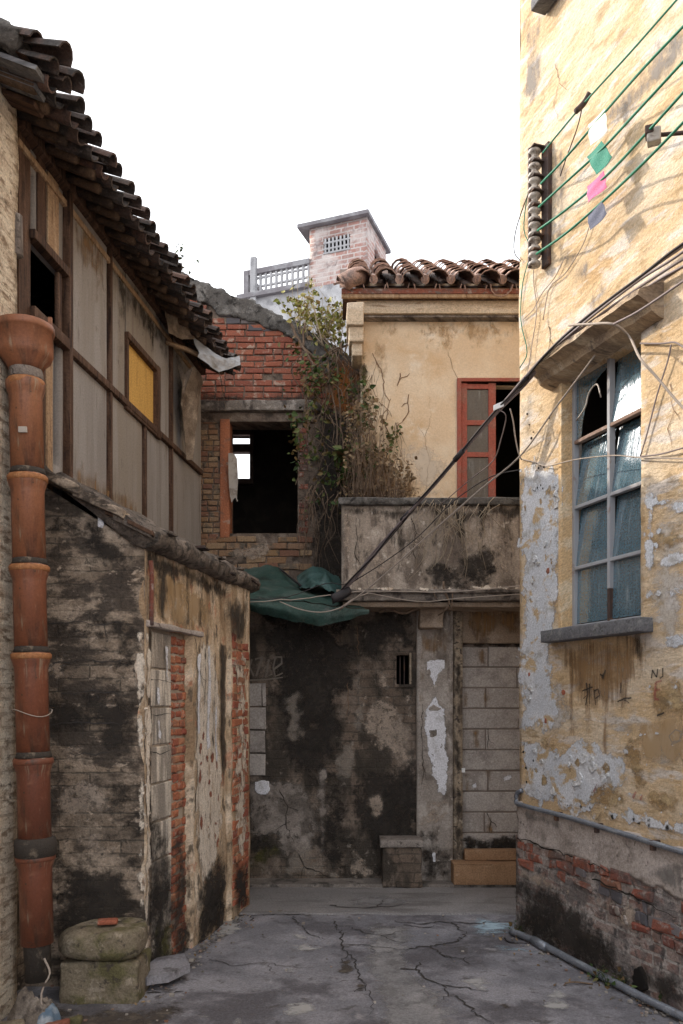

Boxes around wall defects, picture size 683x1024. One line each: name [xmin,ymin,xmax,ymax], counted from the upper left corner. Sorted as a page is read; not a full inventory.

damp [420,546,518,591]
damp [70,612,138,669]
peeling [516,456,683,834]
damp [565,636,640,703]
damp [58,781,139,820]
flaking render [232,634,250,909]
damp [266,612,520,878]
peeling [424,705,448,750]
damp [53,850,136,931]
crack [238,900,509,1024]
damp [474,870,682,1006]
flaking render [518,842,683,955]